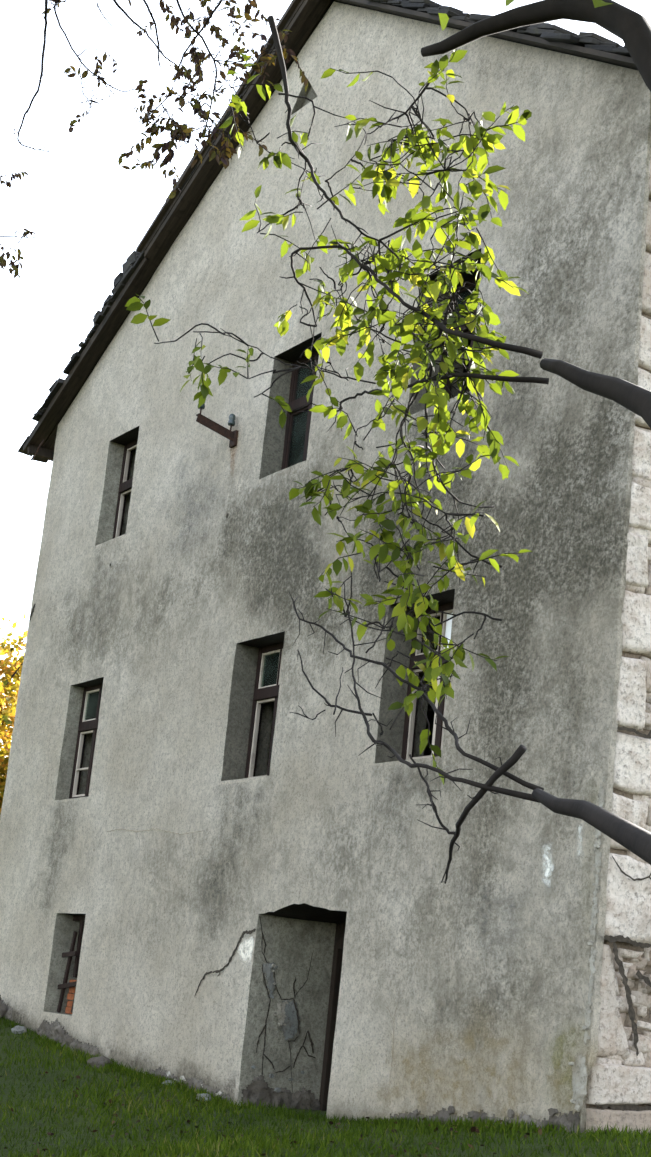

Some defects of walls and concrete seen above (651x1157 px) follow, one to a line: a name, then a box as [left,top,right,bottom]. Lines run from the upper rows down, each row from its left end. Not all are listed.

damp [543,847,553,885]
crack [612,856,651,881]
crack [195,916,315,1094]
crack [604,935,651,1056]